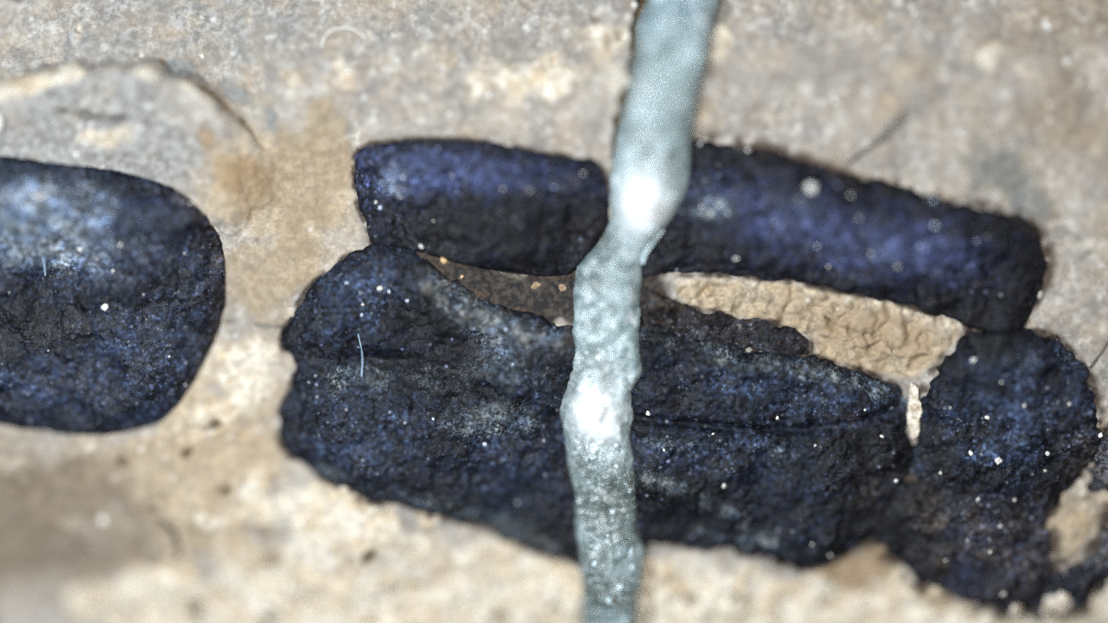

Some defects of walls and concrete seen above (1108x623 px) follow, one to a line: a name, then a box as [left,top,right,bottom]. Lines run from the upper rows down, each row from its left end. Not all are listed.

crack [612,0,646,160]